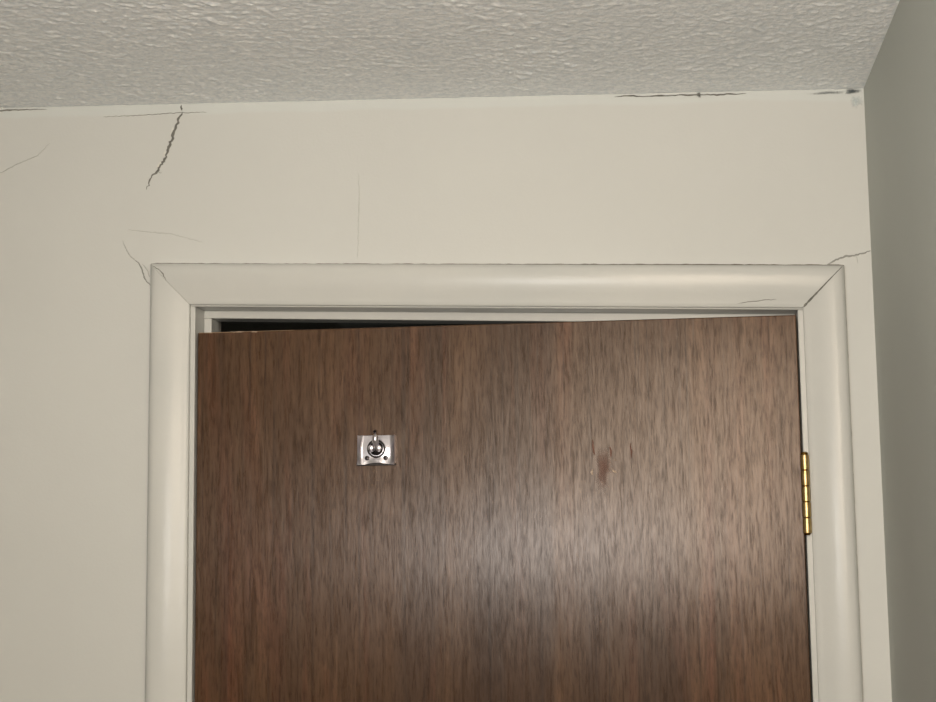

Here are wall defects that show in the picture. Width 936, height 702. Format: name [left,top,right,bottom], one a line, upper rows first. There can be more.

crack [107,105,206,190]